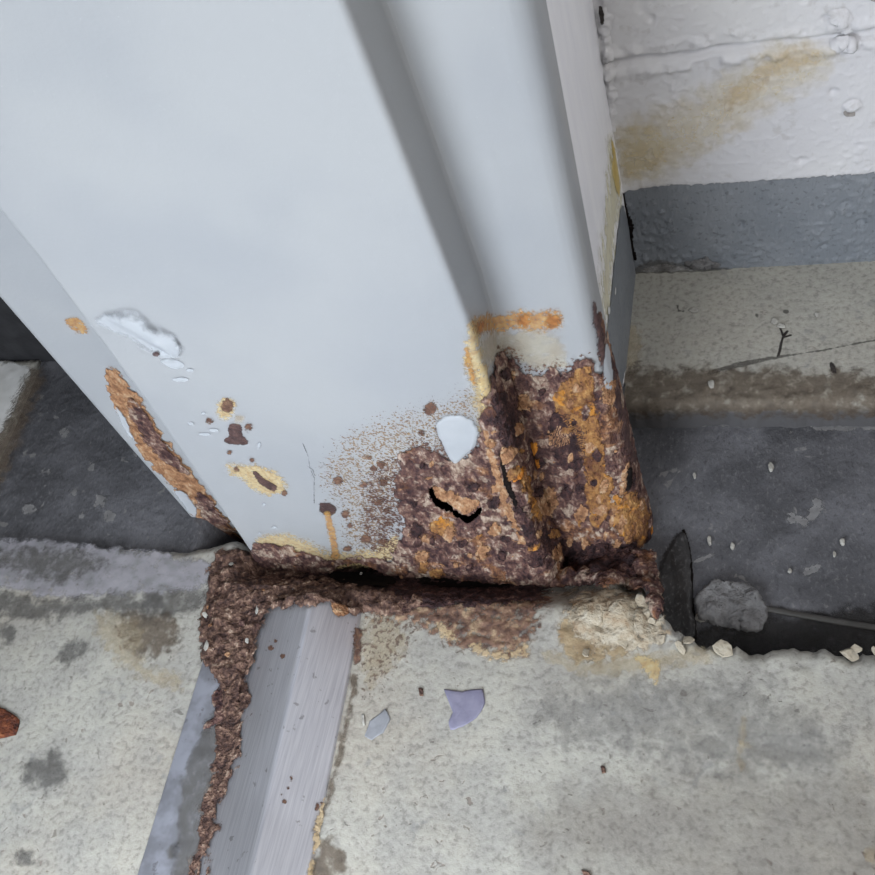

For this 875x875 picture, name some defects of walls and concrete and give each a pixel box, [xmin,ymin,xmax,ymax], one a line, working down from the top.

rust [104,301,665,700]
spalling [562,529,697,657]
spalling [712,639,733,658]
spalling [839,644,875,662]